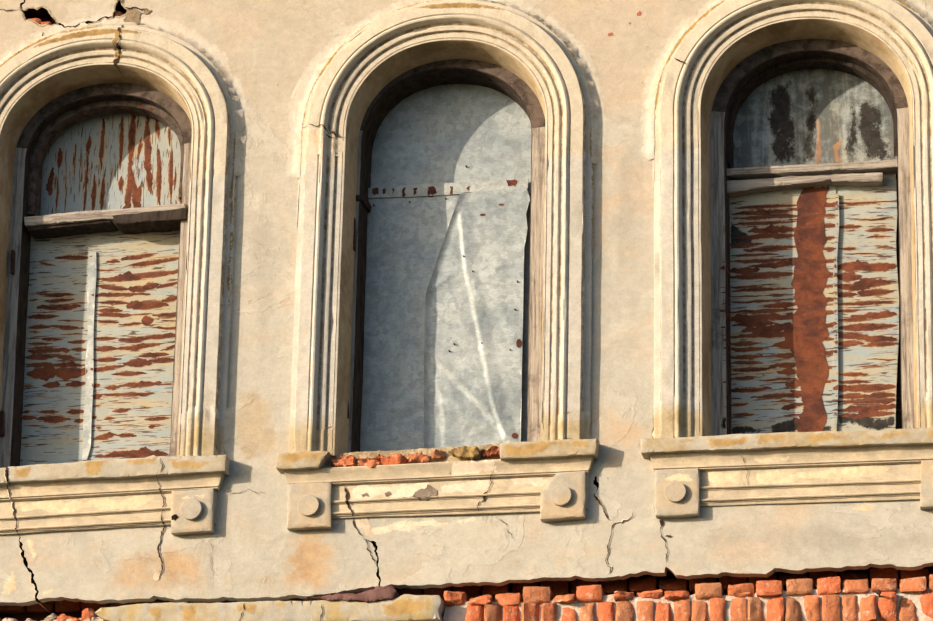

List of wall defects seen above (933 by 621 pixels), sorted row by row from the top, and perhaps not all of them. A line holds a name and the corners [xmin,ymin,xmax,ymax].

crack [39,0,148,79]
rust [46,103,181,211]
rust [18,253,179,440]
rust [719,186,902,432]
crack [4,468,49,612]
rust [95,446,169,458]
crack [156,461,167,578]
crack [343,484,381,586]
peeling [356,516,477,538]
peeling [350,445,500,501]
peeling [511,477,548,487]
spalling [0,608,105,621]